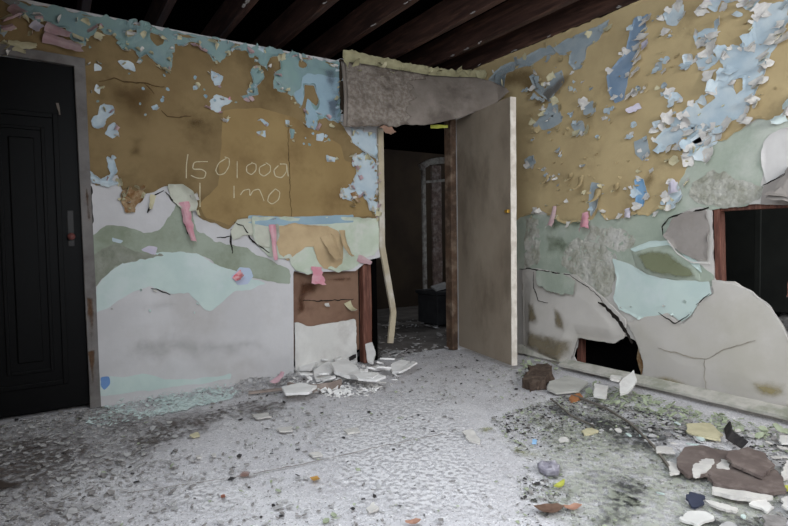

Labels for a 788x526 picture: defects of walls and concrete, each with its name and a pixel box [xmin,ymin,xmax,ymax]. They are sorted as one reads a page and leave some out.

crack [99,77,190,118]
peeling [0,0,788,321]
spalling [575,336,641,375]